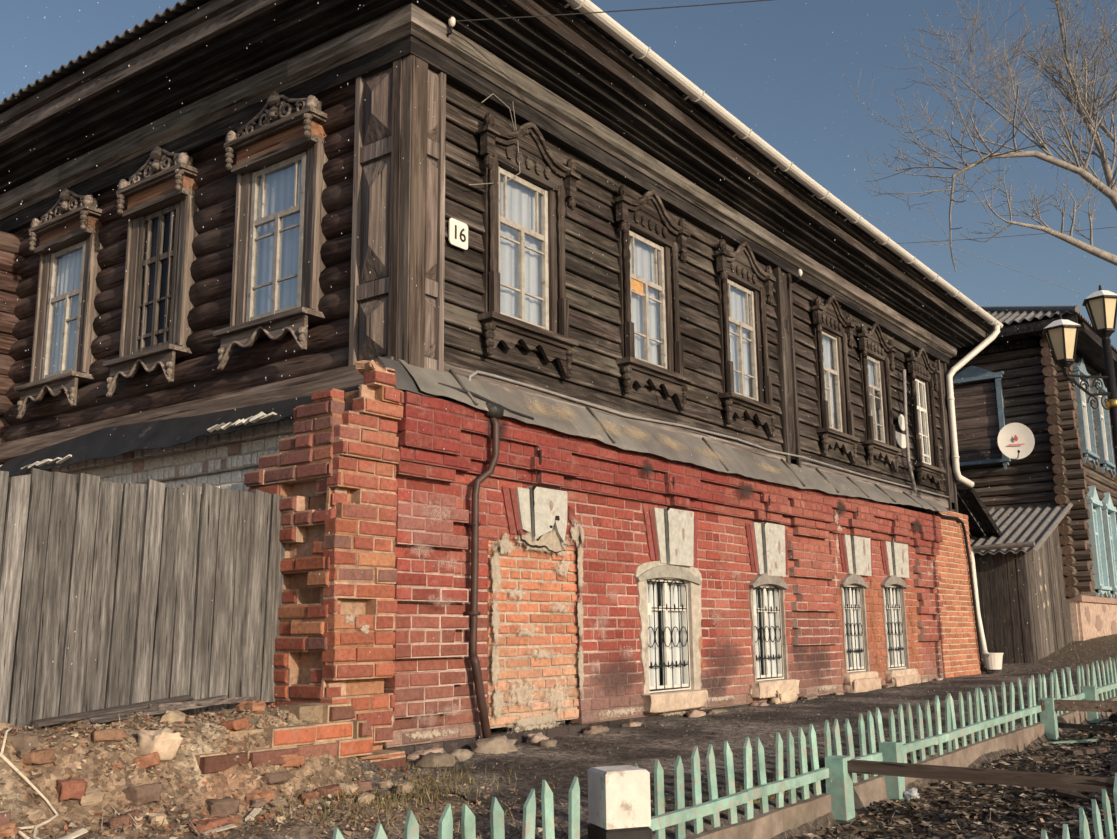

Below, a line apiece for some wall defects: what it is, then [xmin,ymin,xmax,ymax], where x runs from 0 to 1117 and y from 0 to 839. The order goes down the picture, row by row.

peeling [490,501,585,732]
flaking render [599,707,643,717]